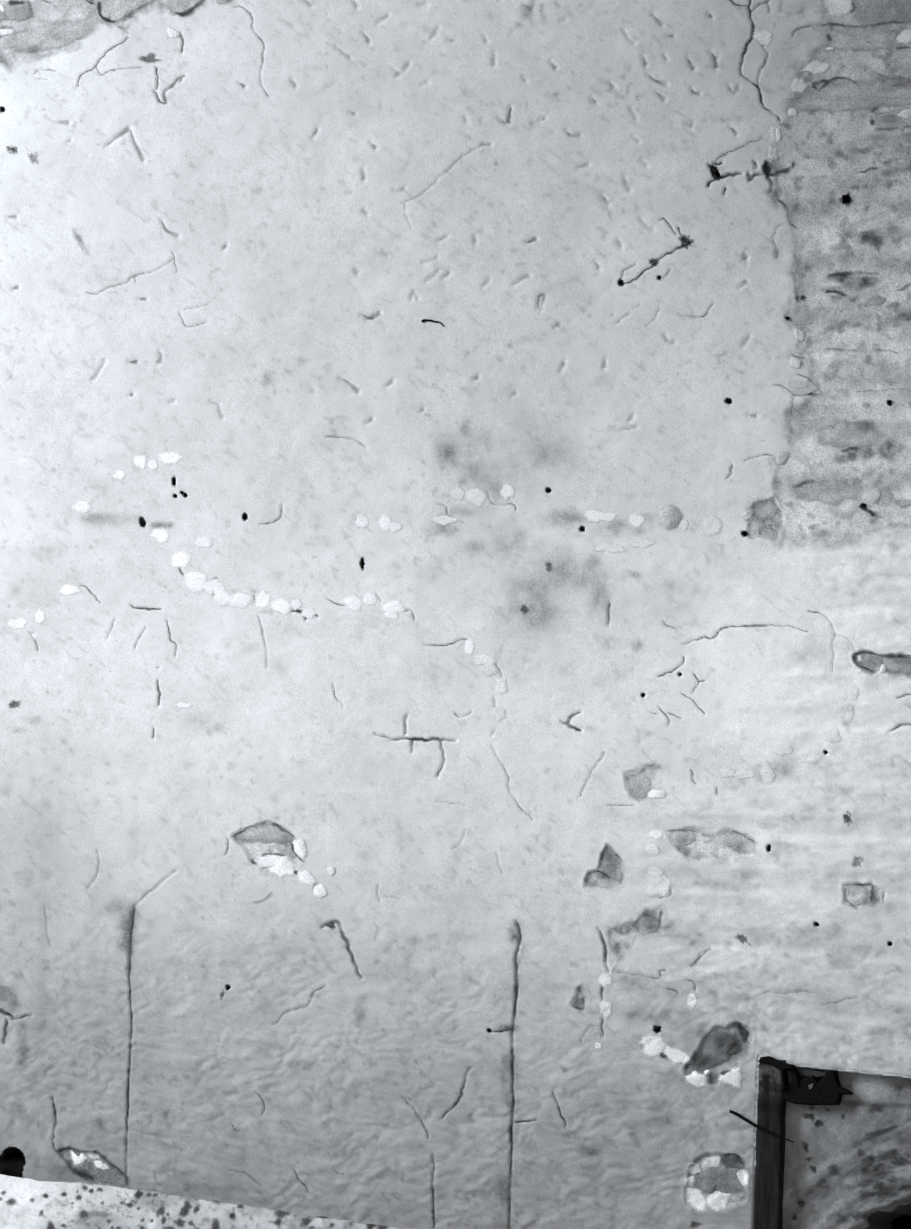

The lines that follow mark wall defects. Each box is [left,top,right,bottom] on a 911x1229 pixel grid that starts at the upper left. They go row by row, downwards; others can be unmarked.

flaking render [0,0,227,70]
crack [730,0,780,121]
crack [619,218,683,285]
crack [653,624,771,717]
flaking render [824,650,911,754]
crack [381,736,441,774]
flaking render [585,844,622,889]
flaking render [607,827,771,957]
crack [125,909,135,1181]
crack [496,923,566,1173]
flaking render [640,1023,752,1088]
flaking render [685,1153,751,1227]